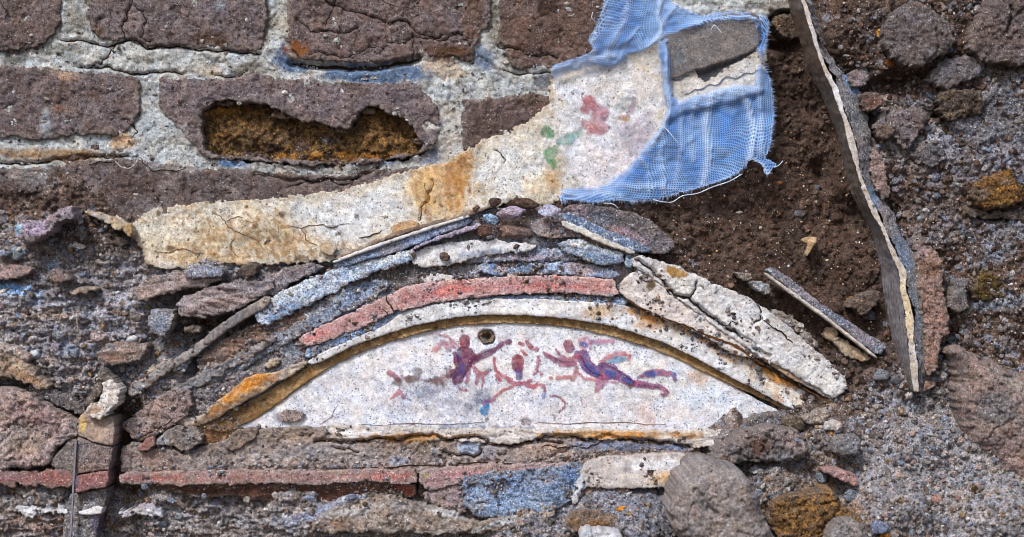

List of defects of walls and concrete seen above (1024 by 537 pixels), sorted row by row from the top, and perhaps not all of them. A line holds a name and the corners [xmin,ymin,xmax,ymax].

spalling [202,100,423,165]
peeling [877,76,1024,294]
crack [212,211,263,257]
peeling [0,210,137,387]
spalling [153,297,263,359]
crack [624,258,834,403]
peeling [947,305,1024,365]
peeling [138,435,158,451]
peeling [839,413,1024,537]
peeling [8,495,64,537]